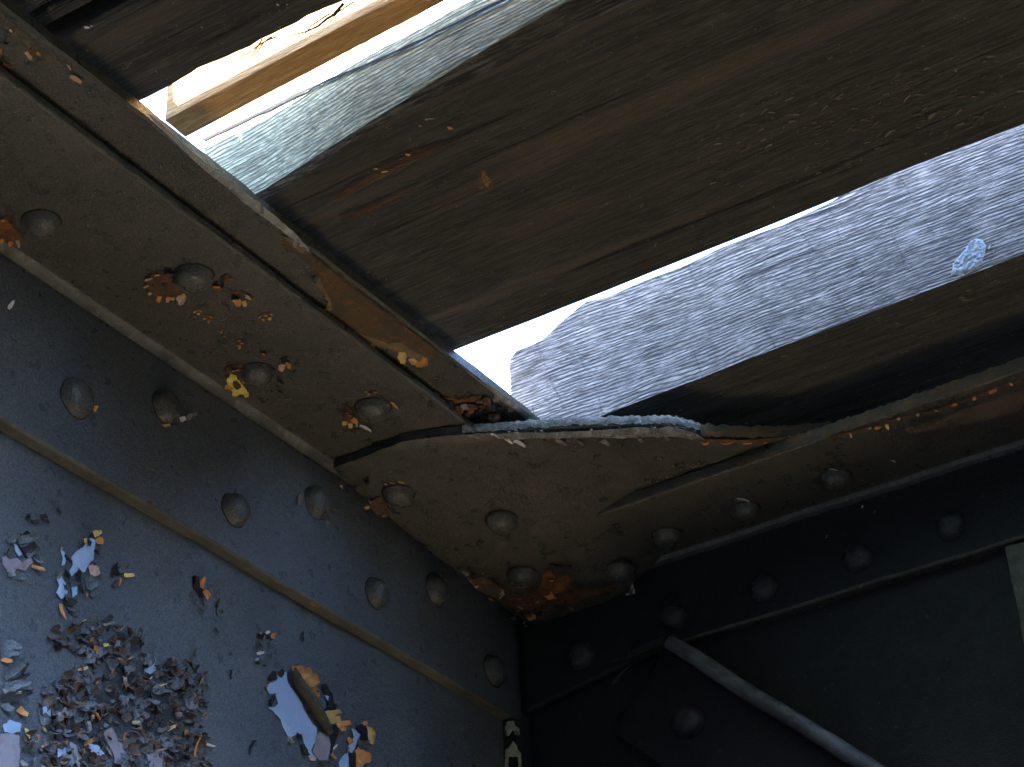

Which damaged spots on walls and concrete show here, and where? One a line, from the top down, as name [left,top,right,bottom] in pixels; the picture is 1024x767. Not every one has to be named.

peeling [2,508,62,580]
peeling [0,530,216,767]
peeling [191,575,224,615]
peeling [255,630,376,767]